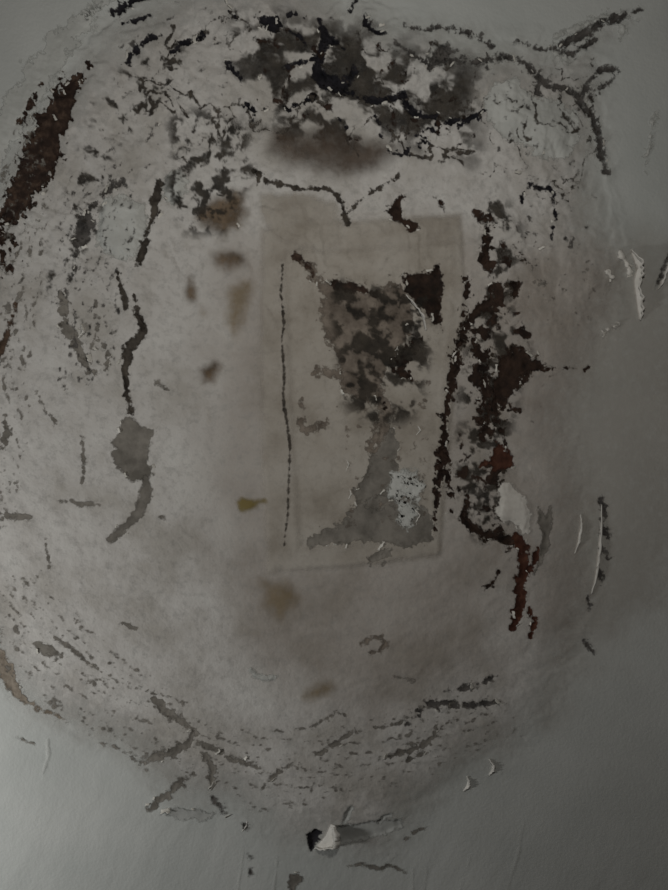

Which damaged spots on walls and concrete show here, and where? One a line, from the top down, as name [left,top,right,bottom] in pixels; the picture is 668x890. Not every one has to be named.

flaking render [86,0,143,17]
leakage [233,18,476,171]
crack [133,8,644,240]
crack [116,178,165,415]
flaking render [306,263,417,454]
leakage [333,283,435,422]
flaking render [388,467,426,528]
flaking render [401,265,445,325]
crack [432,224,522,547]
leakage [458,246,516,525]
corrosion [478,441,515,472]
corrosion [509,532,540,639]